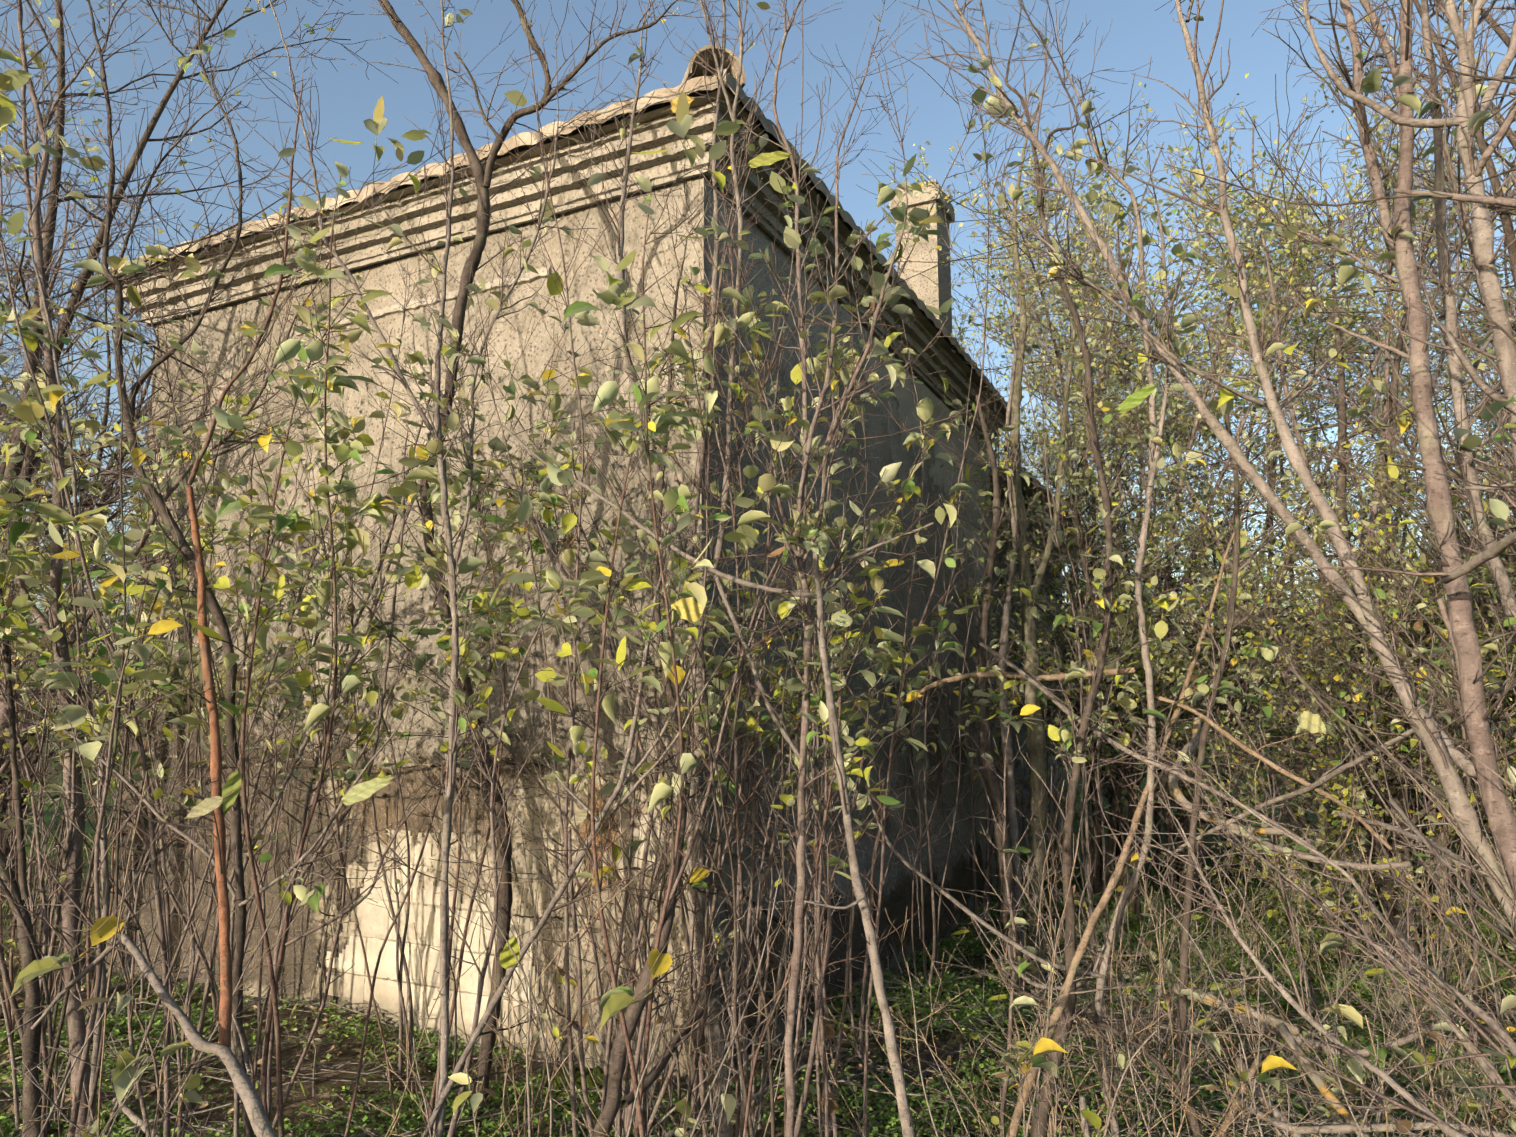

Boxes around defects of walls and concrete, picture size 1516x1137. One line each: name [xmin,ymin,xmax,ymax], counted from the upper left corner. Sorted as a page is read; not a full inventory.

spalling [311,829,565,1051]